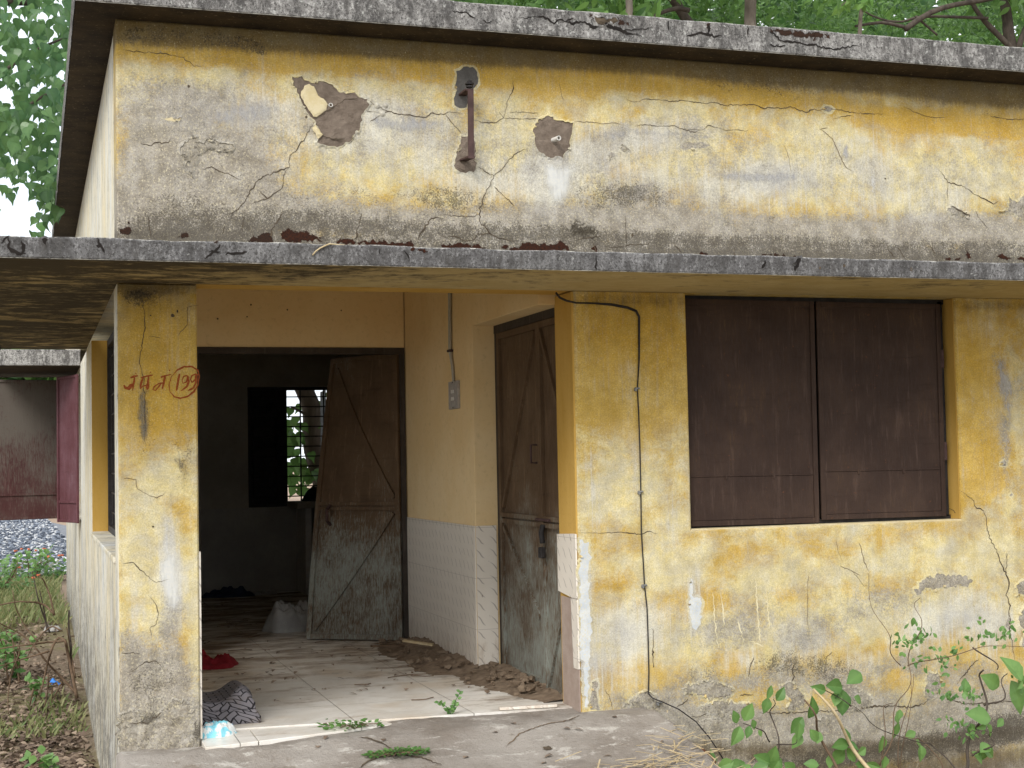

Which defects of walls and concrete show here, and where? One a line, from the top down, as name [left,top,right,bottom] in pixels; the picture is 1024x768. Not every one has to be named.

flaking render [290,74,372,151]
flaking render [530,114,576,161]
crack [579,99,882,170]
crack [205,125,313,259]
corrosion [280,229,322,243]
corrosion [336,239,428,253]
crack [379,149,524,258]
corrosion [501,240,569,251]
water stain [138,392,148,437]
peeling [576,536,603,711]
peeling [686,574,705,632]
crack [949,492,1015,659]